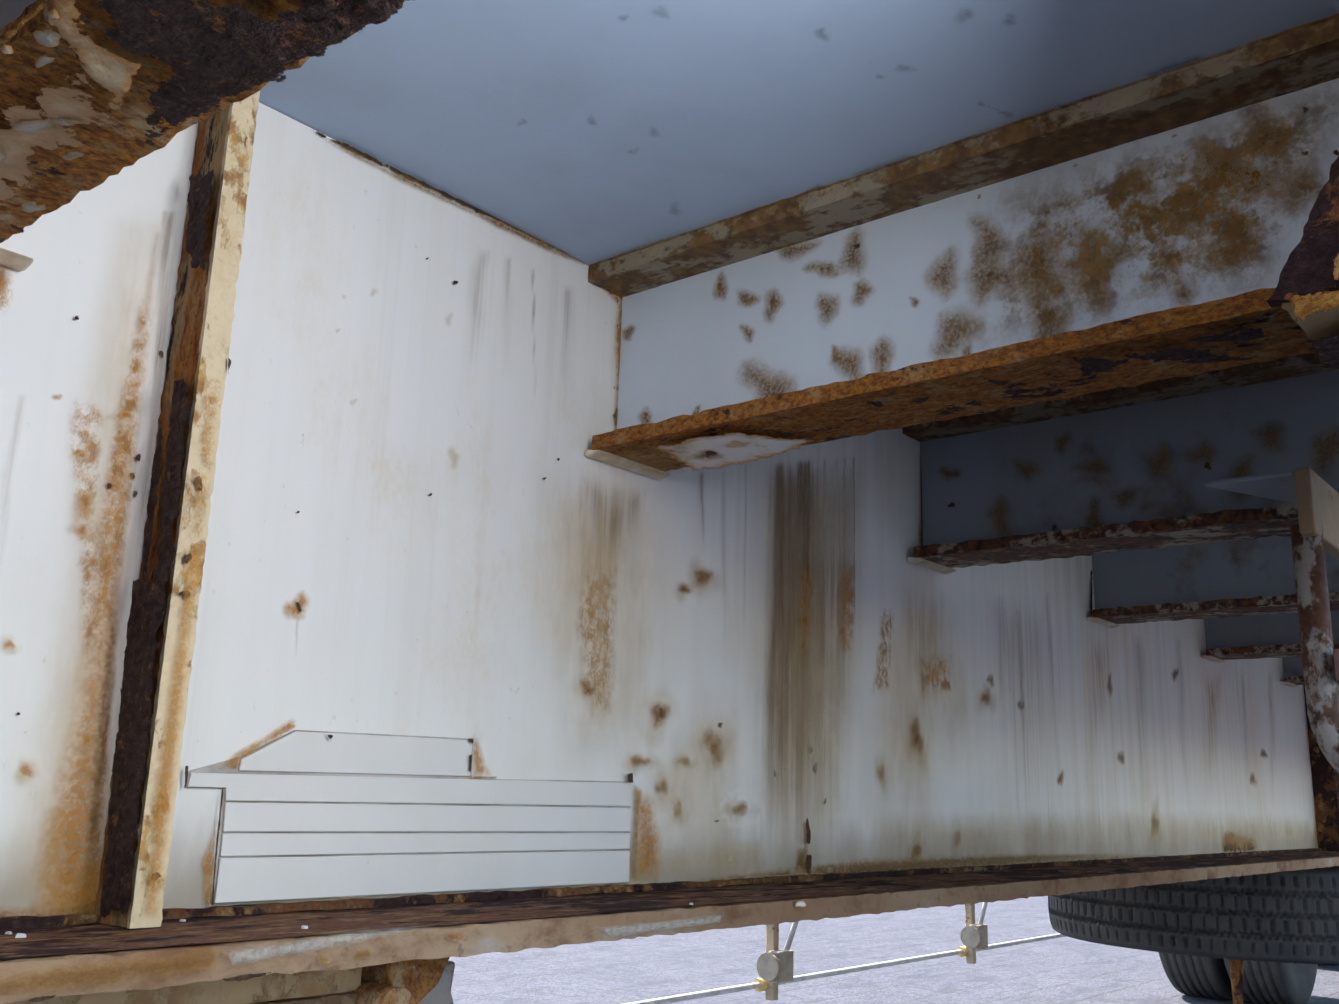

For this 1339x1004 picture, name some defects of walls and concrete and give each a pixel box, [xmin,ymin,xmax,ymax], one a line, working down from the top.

peeling [0,0,141,213]
corrosion [972,105,1321,338]
corrosion [782,234,861,275]
corrosion [819,298,836,318]
corrosion [854,284,871,302]
corrosion [931,255,953,292]
corrosion [1290,290,1339,322]
corrosion [938,315,976,355]
corrosion [832,341,889,379]
corrosion [36,341,143,917]
corrosion [582,577,610,703]
corrosion [149,551,196,909]